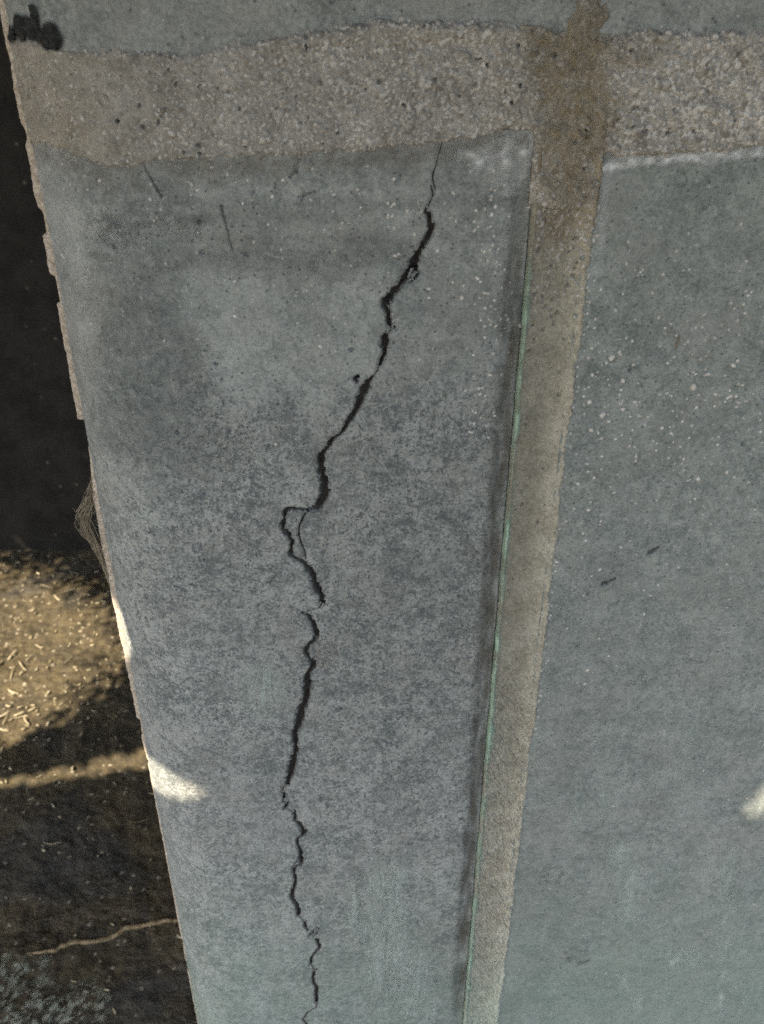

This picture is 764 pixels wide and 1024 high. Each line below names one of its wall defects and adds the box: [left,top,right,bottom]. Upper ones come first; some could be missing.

crack [269,142,443,1024]